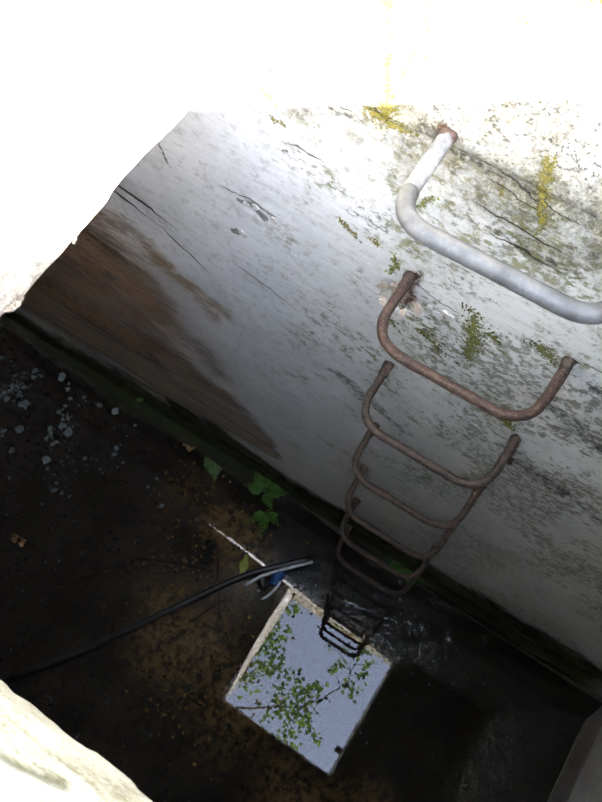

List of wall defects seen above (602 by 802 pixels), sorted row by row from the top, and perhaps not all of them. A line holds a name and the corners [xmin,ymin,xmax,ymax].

crack [113,185,210,274]
corrosion [398,270,422,309]
corrosion [378,360,395,378]
corrosion [559,356,578,377]
corrosion [506,434,521,465]